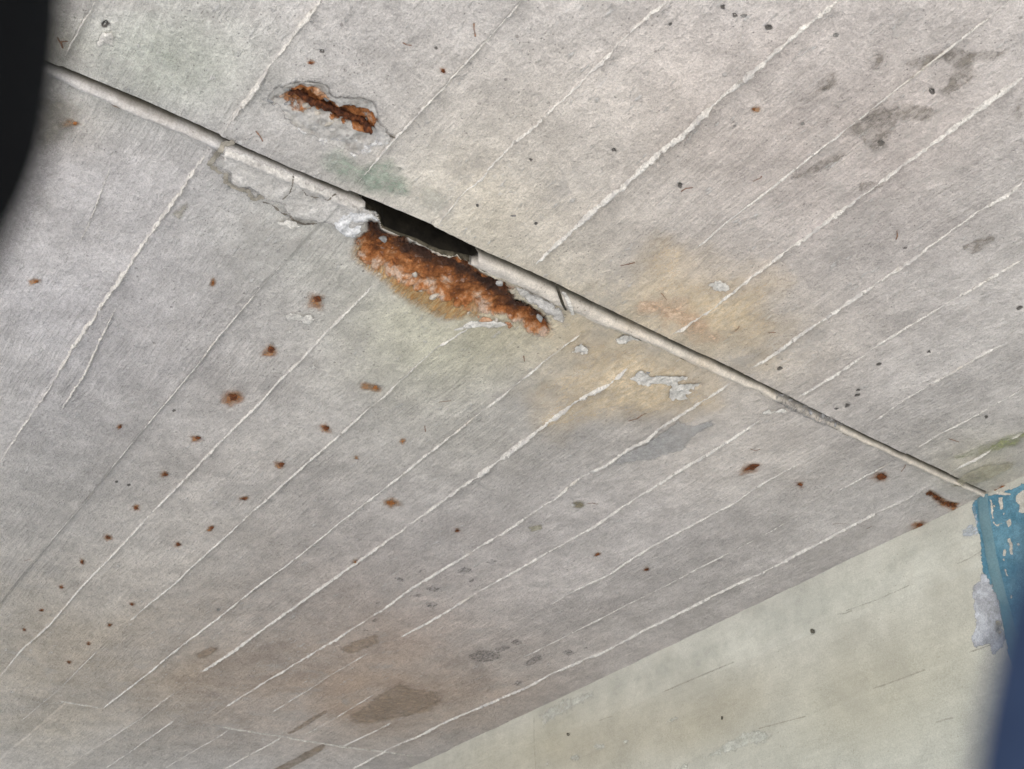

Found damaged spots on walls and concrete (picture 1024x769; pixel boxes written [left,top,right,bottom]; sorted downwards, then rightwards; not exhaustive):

spalling [267,82,395,156]
crack [282,174,337,201]
spalling [334,194,564,336]
corrosion [223,393,242,405]
peeling [630,371,700,401]
peeling [990,490,1024,576]
peeling [972,574,1002,654]